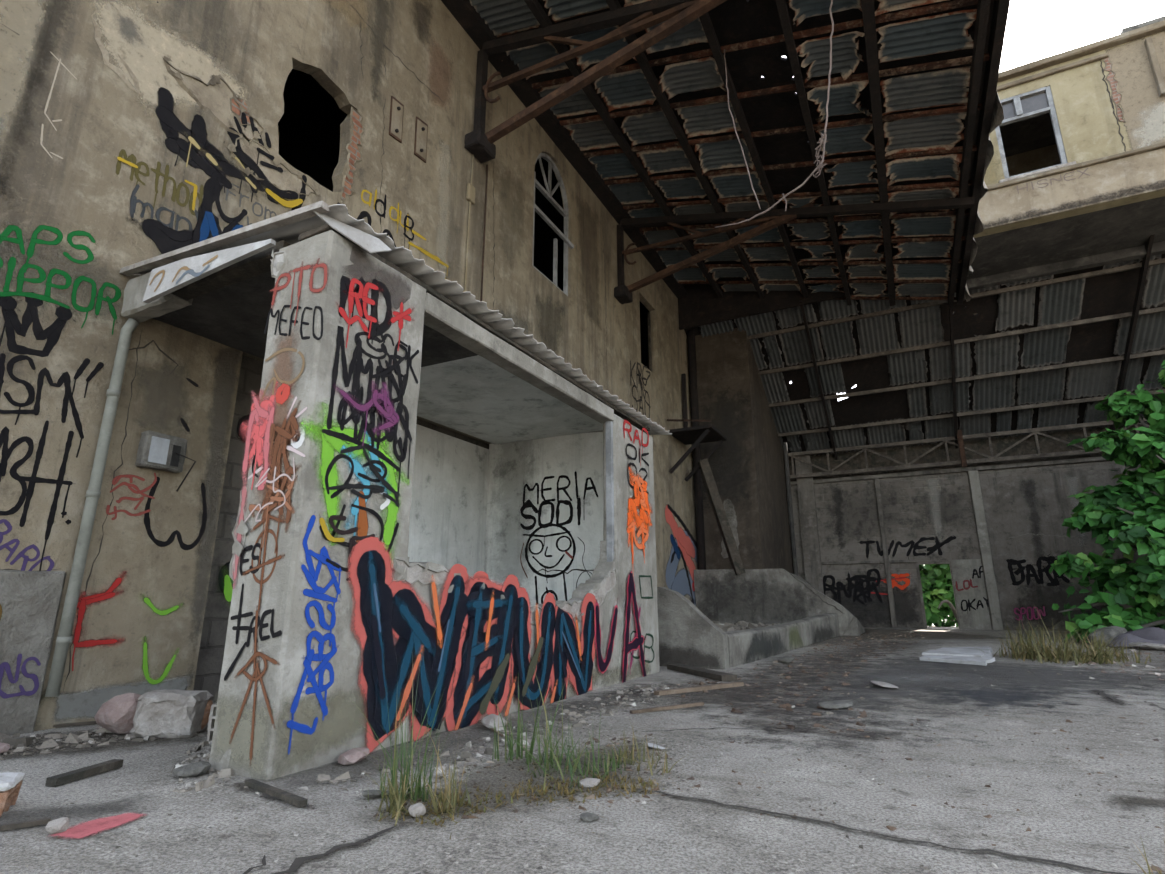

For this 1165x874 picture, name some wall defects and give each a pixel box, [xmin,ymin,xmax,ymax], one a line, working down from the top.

leakage [20,0,68,137]
flaking render [91,0,321,196]
flaking render [341,106,364,200]
flaking render [1103,32,1165,150]
crack [243,820,411,874]